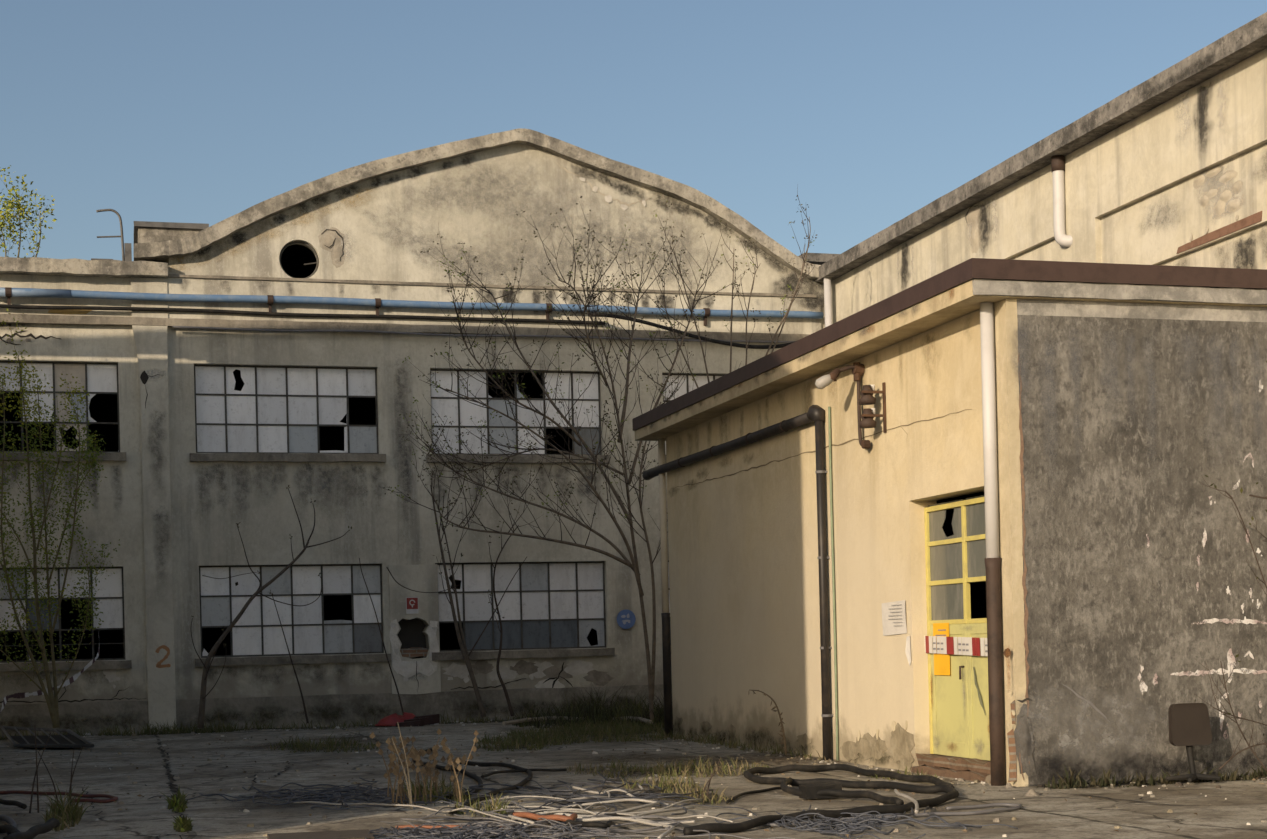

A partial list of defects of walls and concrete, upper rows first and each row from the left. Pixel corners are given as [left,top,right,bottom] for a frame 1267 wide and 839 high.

water stain [1181,85,1223,133]
water stain [966,202,997,241]
water stain [1220,238,1255,269]
crack [0,331,61,345]
crack [671,409,971,489]
flaking render [389,619,614,692]
peeling [1138,666,1158,695]
peeling [1219,700,1242,739]
flaking render [840,721,915,772]
crack [56,743,385,839]